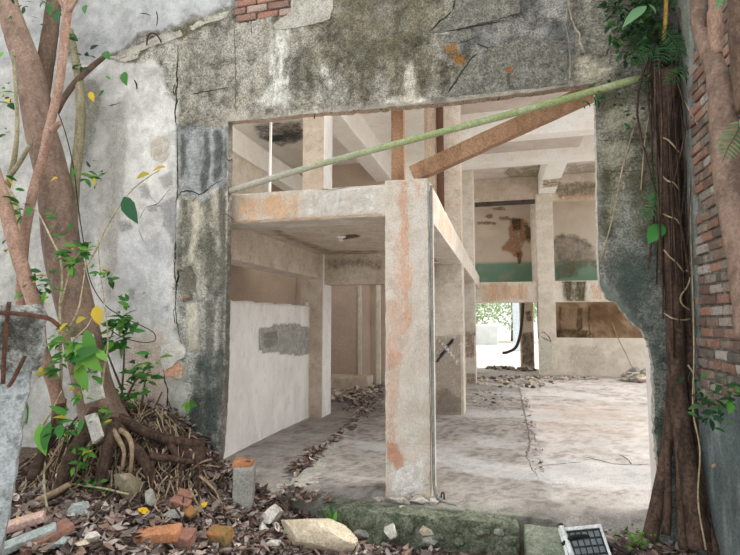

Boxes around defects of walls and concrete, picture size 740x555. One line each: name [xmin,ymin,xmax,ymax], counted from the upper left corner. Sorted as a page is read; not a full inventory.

spalling [110,30,183,62]
peeling [189,0,333,31]
leakage [256,30,291,108]
leakage [386,62,426,104]
crack [429,0,508,92]
leakage [257,122,303,145]
crack [119,21,252,343]
spalling [477,207,531,263]
leakage [148,130,227,451]
peeling [161,343,187,379]
rust [387,382,402,468]
crack [518,385,643,481]